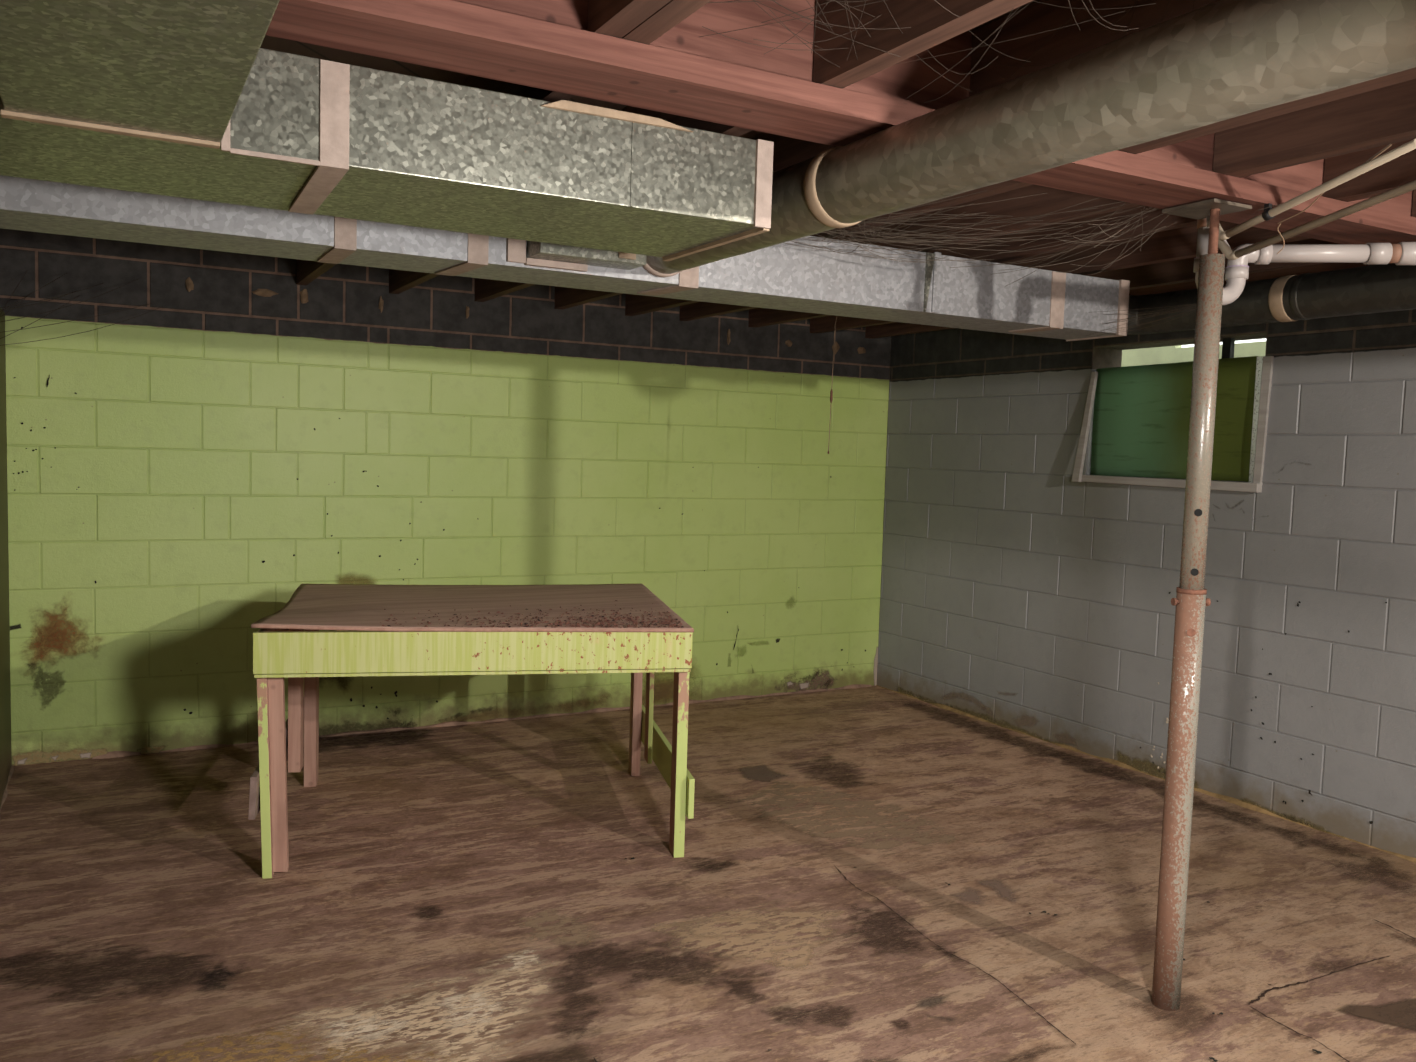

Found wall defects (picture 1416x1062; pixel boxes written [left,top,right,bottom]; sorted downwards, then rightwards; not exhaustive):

rust [29,608,85,702]
leakage [643,672,674,700]
leakage [897,687,1166,794]
leakage [1193,781,1399,886]
leakage [0,946,232,1000]
leakage [515,943,851,1062]
crack [1248,919,1415,1062]